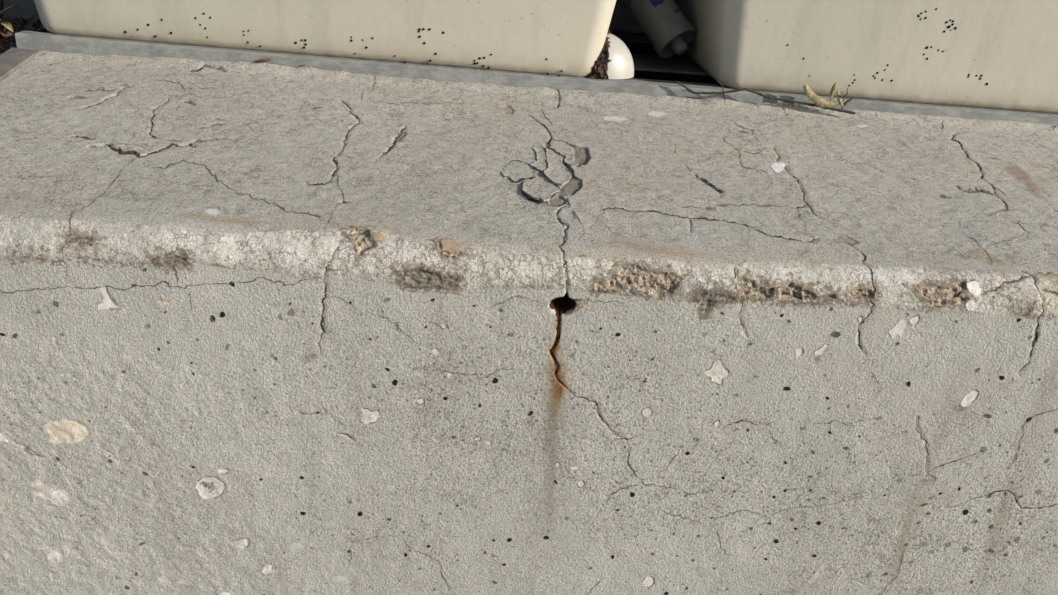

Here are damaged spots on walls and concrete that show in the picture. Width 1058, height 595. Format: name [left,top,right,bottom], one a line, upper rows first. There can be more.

spalling [65,233,97,246]
spalling [153,252,188,268]
crack [0,77,510,390]
peeling [501,138,591,207]
corrosion [552,315,563,398]
spalling [568,262,681,315]
crack [557,120,819,288]
crack [852,245,880,385]
crack [936,121,1058,262]
crack [1012,271,1044,382]
crack [495,295,870,556]
crack [944,408,1057,509]